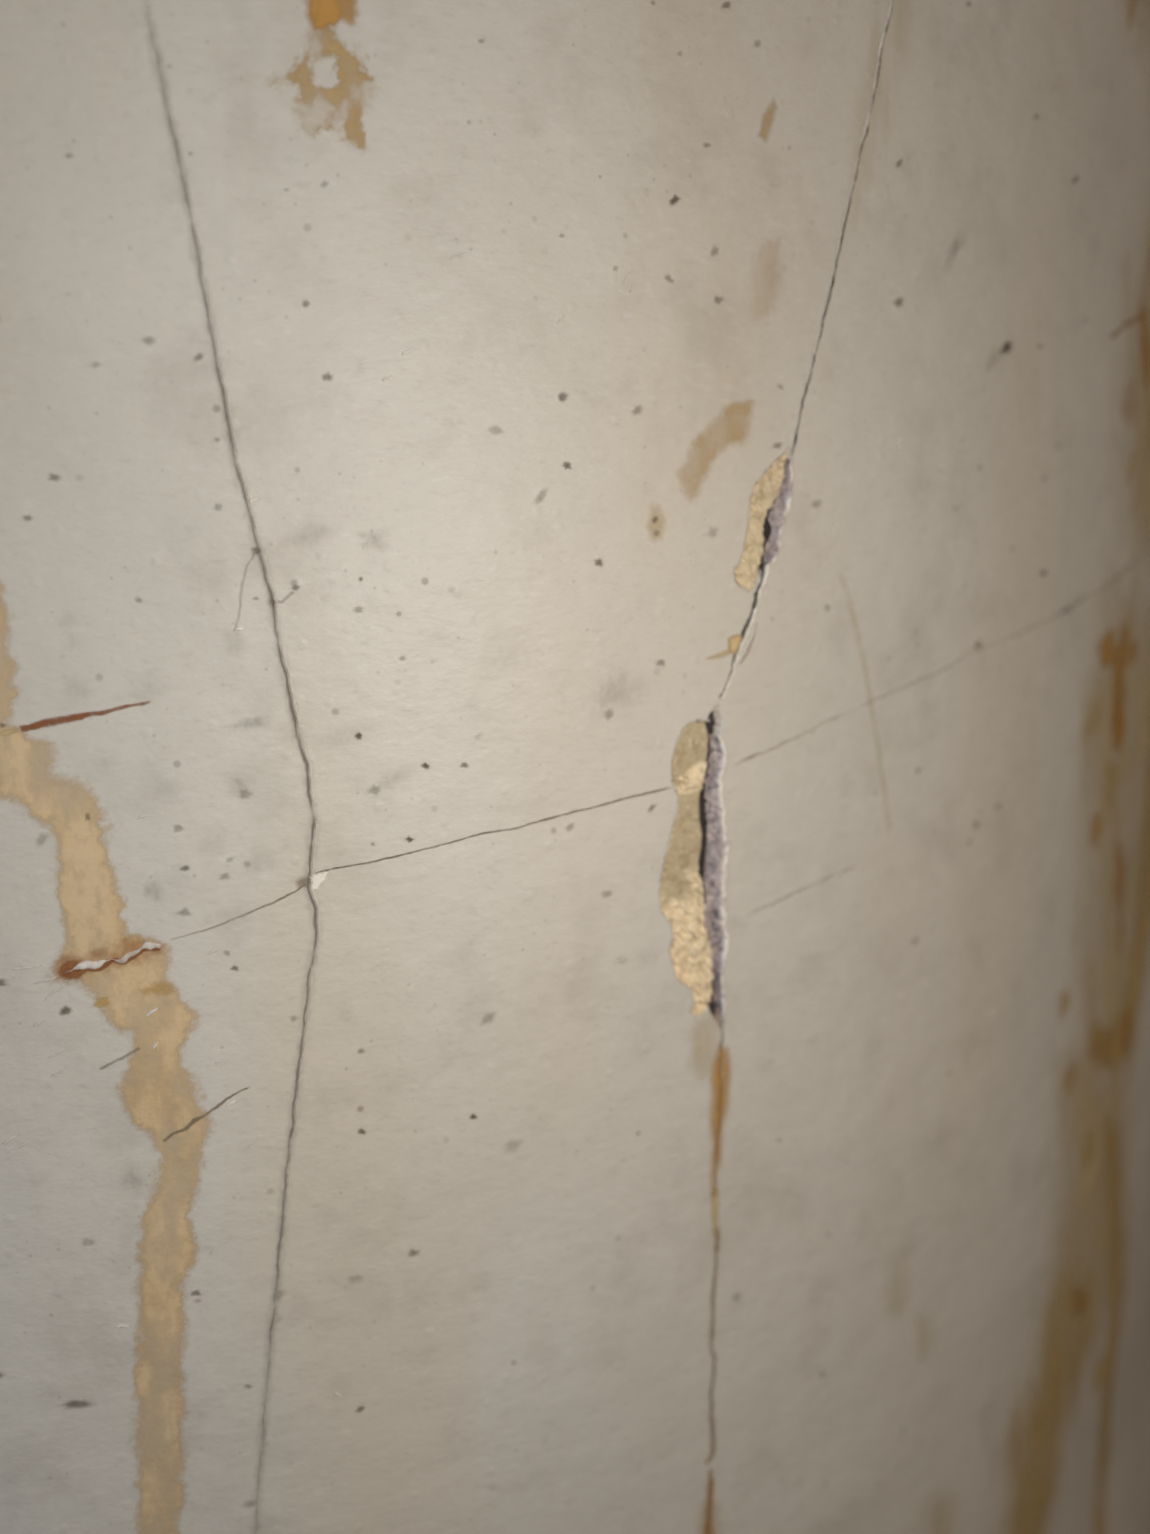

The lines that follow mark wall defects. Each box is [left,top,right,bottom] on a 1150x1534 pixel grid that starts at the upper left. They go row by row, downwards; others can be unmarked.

crack [792,0,893,450]
spalling [734,447,794,592]
crack [720,562,771,700]
crack [278,651,339,917]
crack [449,831,491,843]
crack [526,791,654,825]
spalling [659,711,732,1029]
damp [0,587,208,1534]
rust [712,1047,728,1238]
crack [706,1229,718,1463]
rust [705,1472,713,1534]